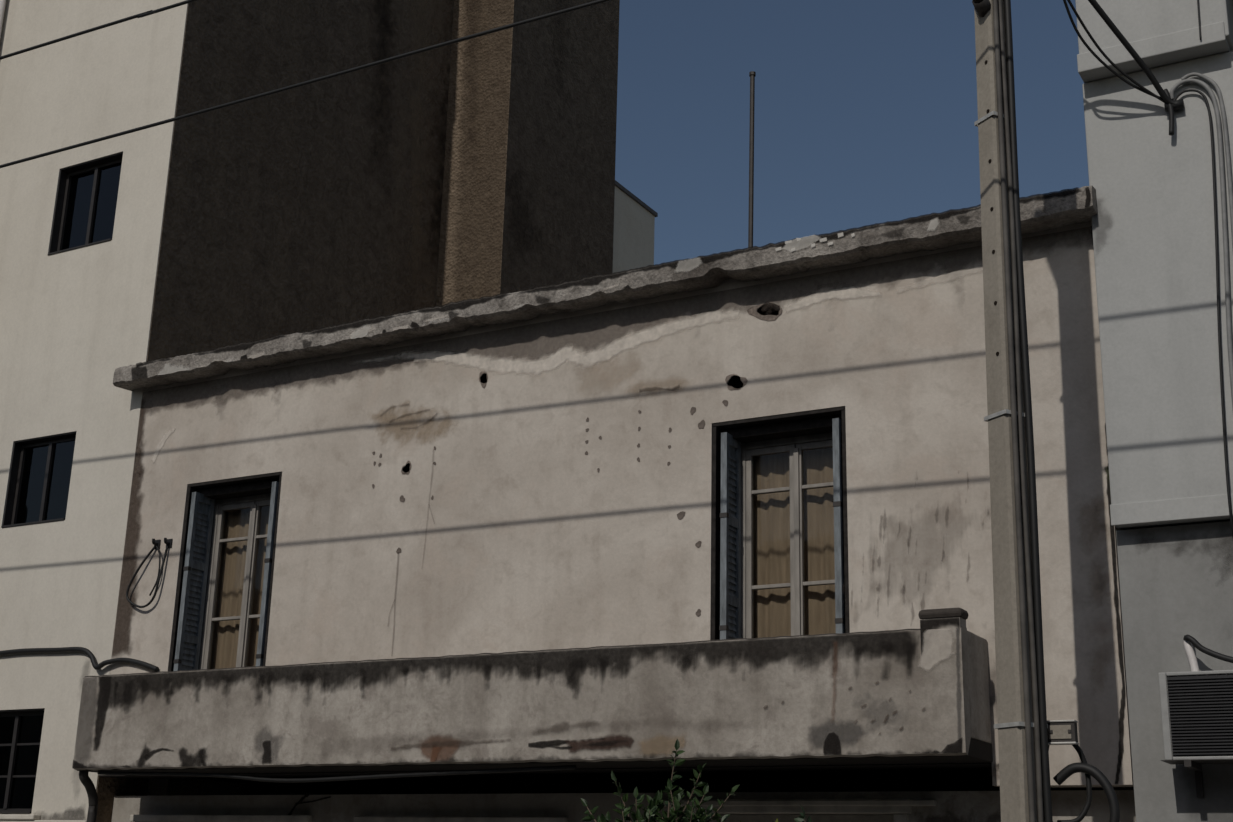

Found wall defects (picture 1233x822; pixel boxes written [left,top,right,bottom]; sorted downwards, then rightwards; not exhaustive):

water stain [1020,187,1081,202]
peeling [776,232,855,252]
water stain [1022,226,1092,250]
peeling [898,267,983,292]
peeling [363,287,881,388]
spalling [722,374,748,406]
water stain [112,204,982,656]
peeling [921,628,952,669]
water stain [94,618,961,756]
water stain [82,746,221,768]
water stain [249,741,271,765]